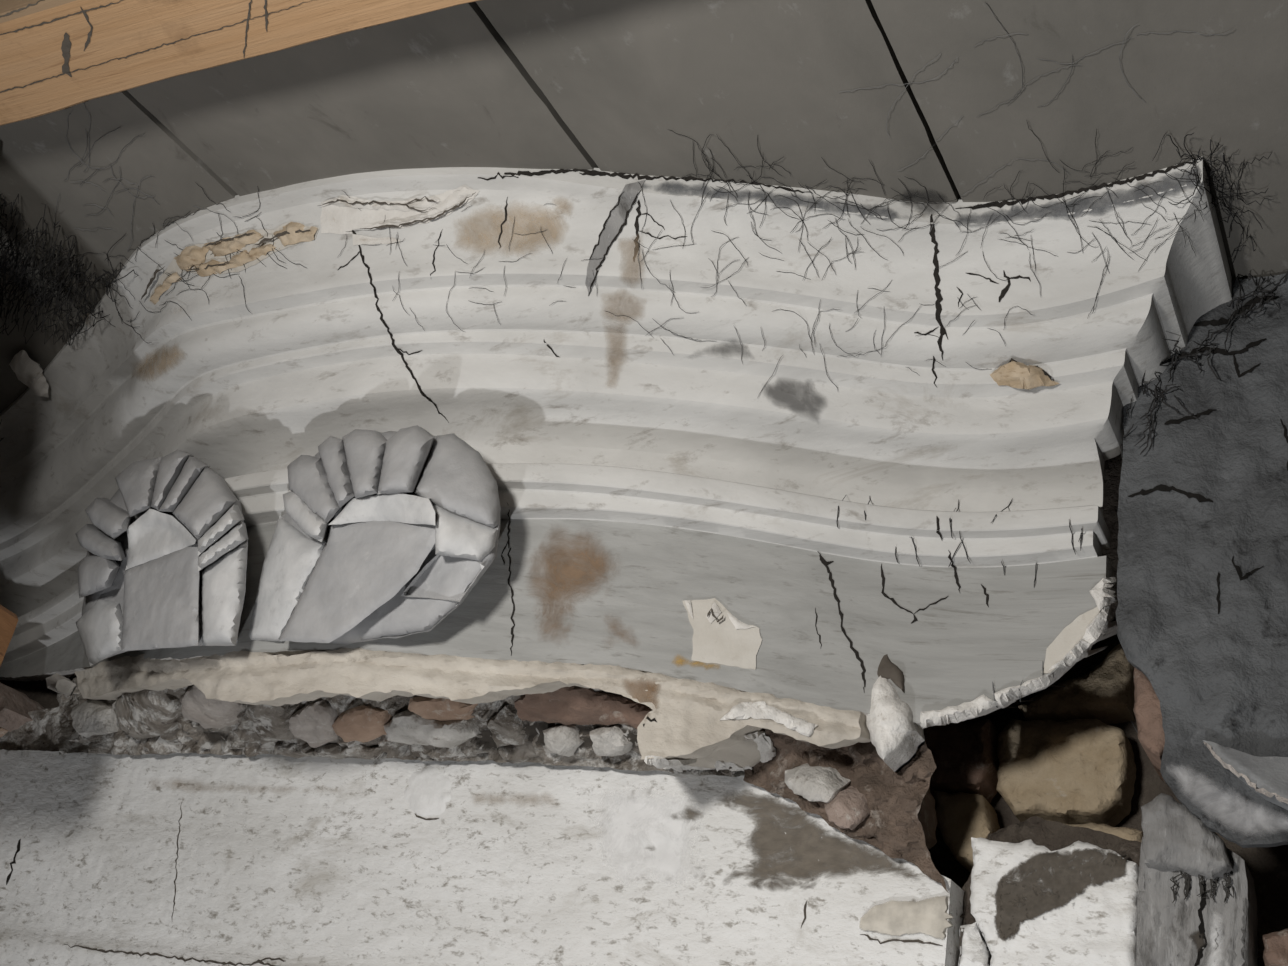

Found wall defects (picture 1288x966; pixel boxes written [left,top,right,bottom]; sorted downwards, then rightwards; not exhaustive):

peeling [141,185,480,304]
crack [338,230,449,423]
damp [468,213,557,248]
crack [478,169,812,261]
peeling [990,358,1060,390]
crack [914,158,1201,387]
crack [501,503,515,655]
peeling [683,598,762,670]
crack [815,552,866,690]
flaking render [920,576,1118,729]
flaking render [644,701,818,772]
damp [722,793,913,890]